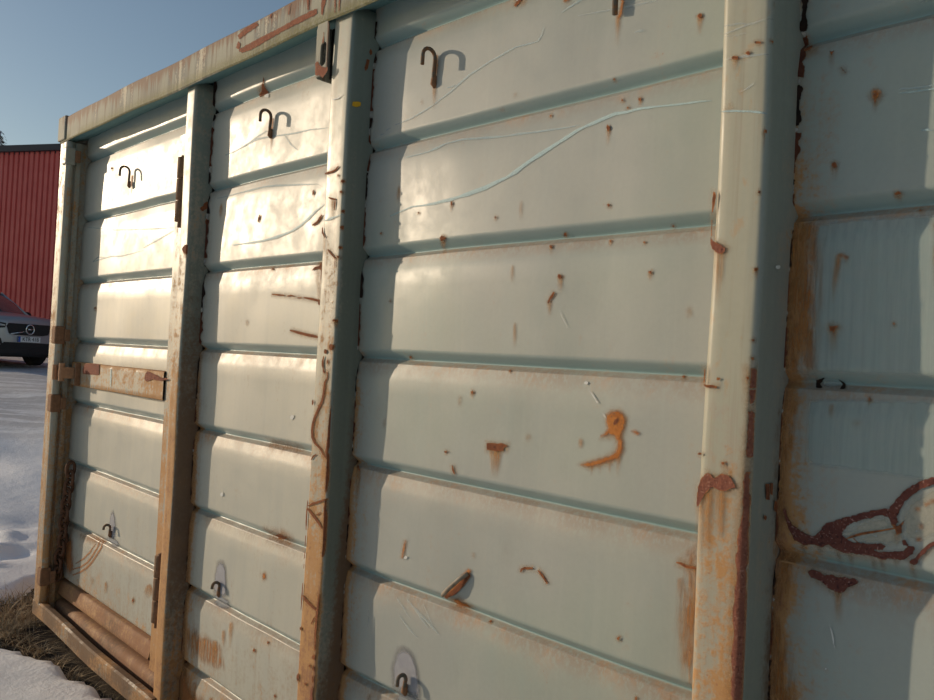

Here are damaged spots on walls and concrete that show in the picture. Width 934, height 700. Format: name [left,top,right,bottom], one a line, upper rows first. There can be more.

corrosion [582,411,638,466]
corrosion [783,477,934,565]
corrosion [444,569,471,607]
corrosion [808,570,858,601]